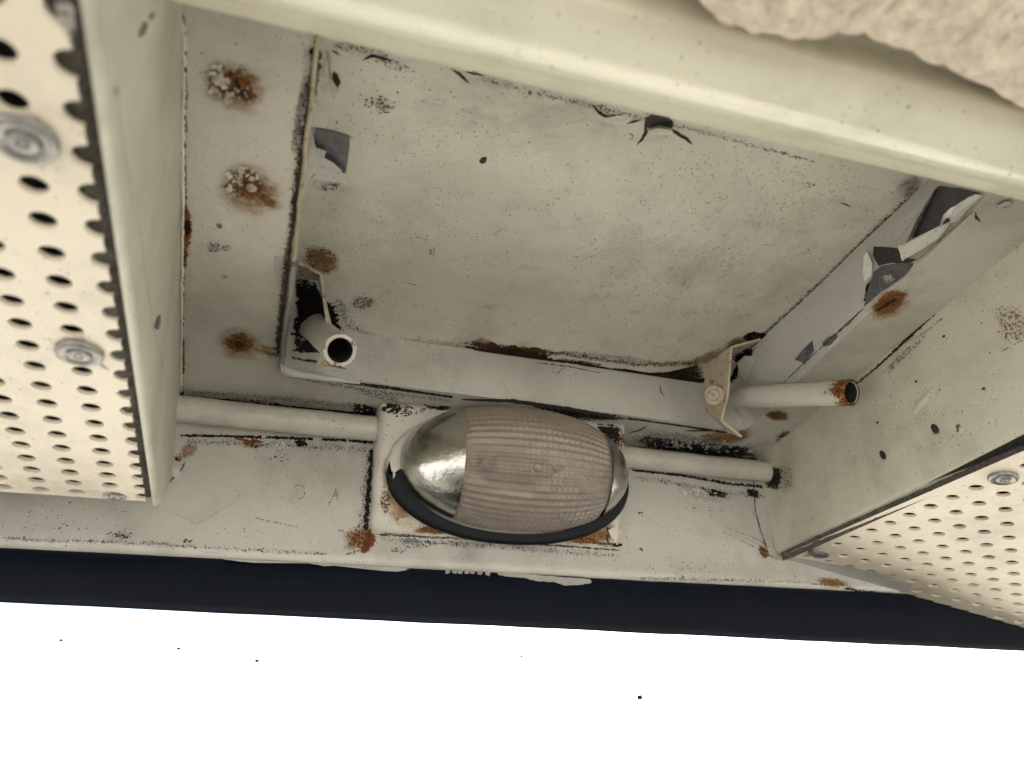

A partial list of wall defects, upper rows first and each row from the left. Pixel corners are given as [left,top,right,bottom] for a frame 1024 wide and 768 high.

corrosion [207,63,259,107]
corrosion [223,165,276,210]
corrosion [302,245,339,274]
corrosion [872,291,907,317]
corrosion [223,332,276,357]
corrosion [462,339,715,383]
corrosion [824,314,935,406]
corrosion [339,527,379,556]